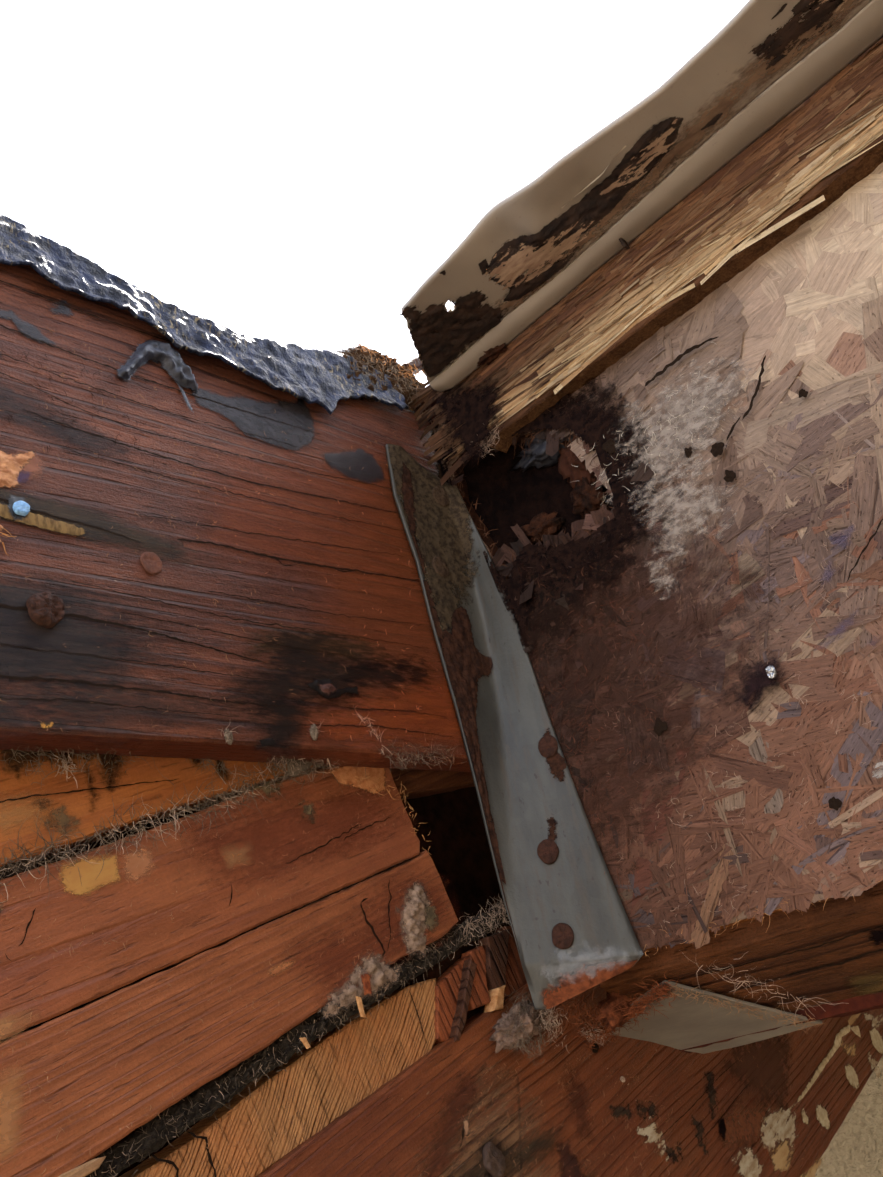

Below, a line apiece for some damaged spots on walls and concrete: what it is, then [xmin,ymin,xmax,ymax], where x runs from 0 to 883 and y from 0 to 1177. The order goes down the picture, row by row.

crack [727,355,766,440]
peeling [0,451,43,488]
water stain [519,359,760,854]
water stain [318,680,461,742]
rust [546,751,567,782]
rust [546,817,558,841]
peeling [848,1013,883,1038]
peeling [732,1108,796,1177]